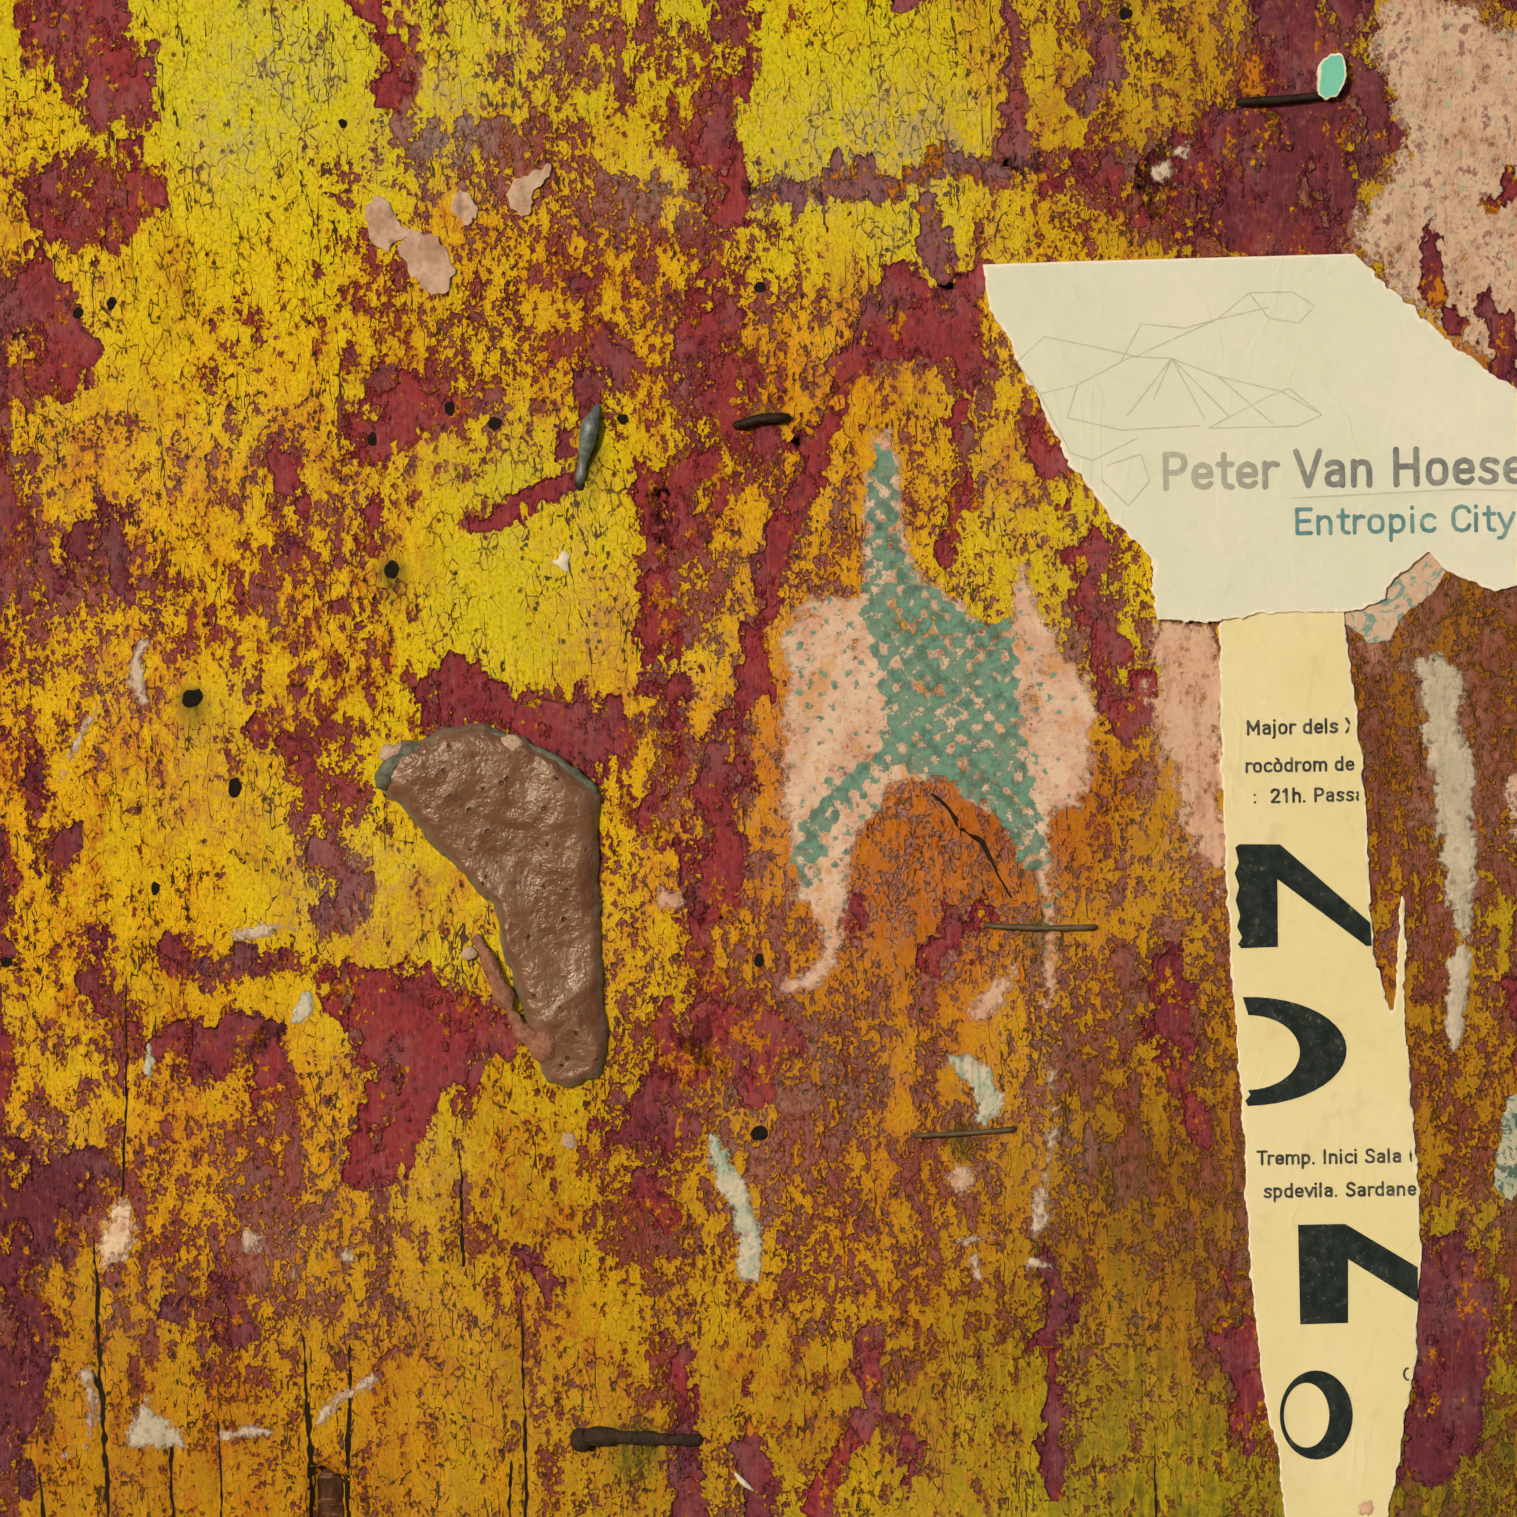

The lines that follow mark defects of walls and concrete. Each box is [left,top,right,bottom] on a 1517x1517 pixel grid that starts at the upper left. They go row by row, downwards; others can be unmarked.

peeling [0,0,184,638]
peeling [1417,216,1517,388]
peeling [411,0,1409,1253]
crack [931,793,1012,899]
peeling [0,826,139,1517]
crack [38,1476,46,1517]
crack [91,1237,110,1517]
crack [168,1444,176,1517]
crack [215,1420,223,1517]
crack [302,1334,352,1517]
peeling [1196,1239,1274,1460]
peeling [1396,1230,1517,1488]